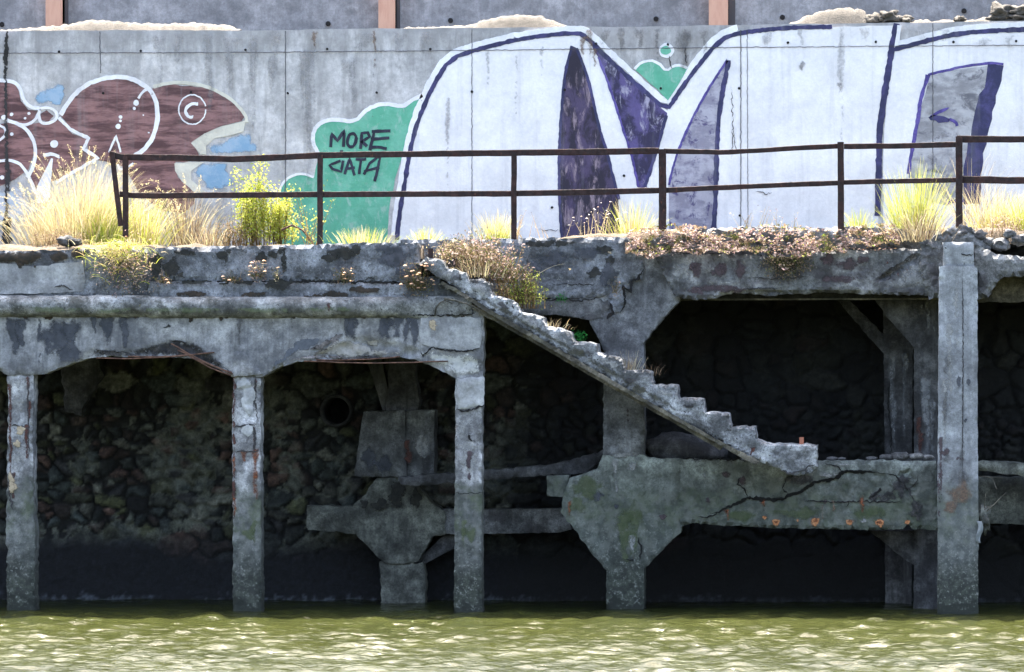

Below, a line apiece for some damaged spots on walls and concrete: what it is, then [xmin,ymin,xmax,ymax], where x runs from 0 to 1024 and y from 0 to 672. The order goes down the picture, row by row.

crack [547,267,679,319]
crack [745,276,806,290]
water stain [6,307,129,362]
water stain [311,307,359,339]
water stain [378,317,419,344]
crack [413,311,474,319]
spalling [88,340,220,367]
crack [420,346,477,357]
rust [232,377,259,516]
crack [686,376,918,518]
rust [937,437,971,516]